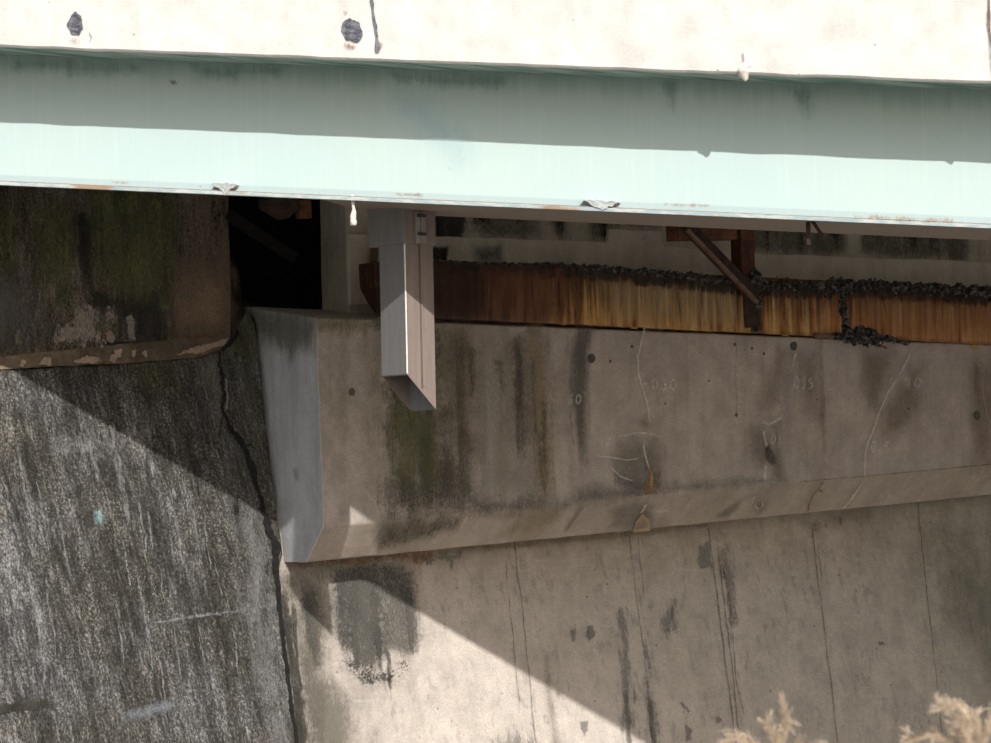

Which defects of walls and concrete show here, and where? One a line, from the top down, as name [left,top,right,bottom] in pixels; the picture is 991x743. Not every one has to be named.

peeling [52,299,147,364]
damp [59,425,153,549]
damp [77,214,175,343]
flaking render [177,338,229,355]
crack [218,330,299,743]
damp [381,338,546,544]
crack [637,328,653,480]
crack [803,350,987,743]
damp [0,699,74,741]
damp [282,564,418,743]
damp [618,607,660,743]
crack [708,530,741,743]